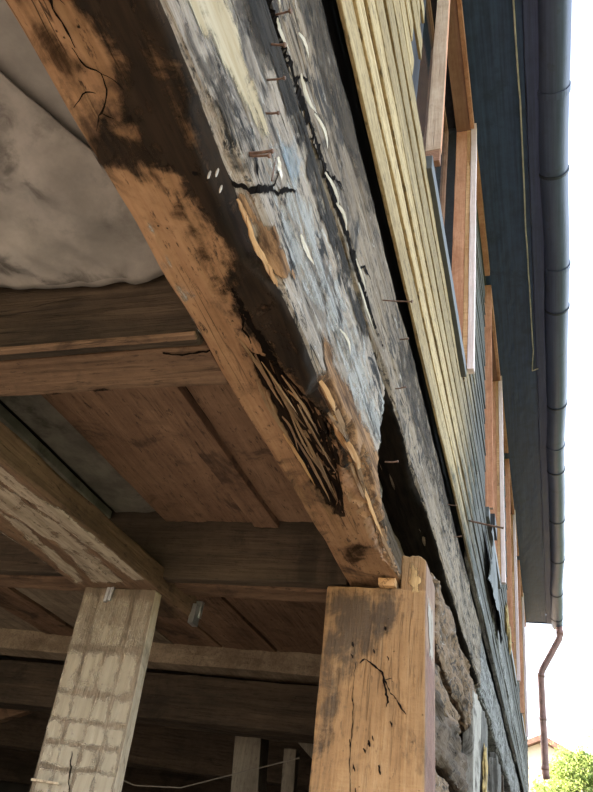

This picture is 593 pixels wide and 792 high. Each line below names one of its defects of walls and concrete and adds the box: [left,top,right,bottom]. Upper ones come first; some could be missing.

crack [49,0,124,131]
peeling [300,73,328,148]
crack [229,150,296,196]
crack [266,0,383,346]
peeling [325,172,347,230]
peeling [300,234,314,264]
peeling [356,259,374,329]
spalling [238,338,396,568]
crack [349,658,406,792]